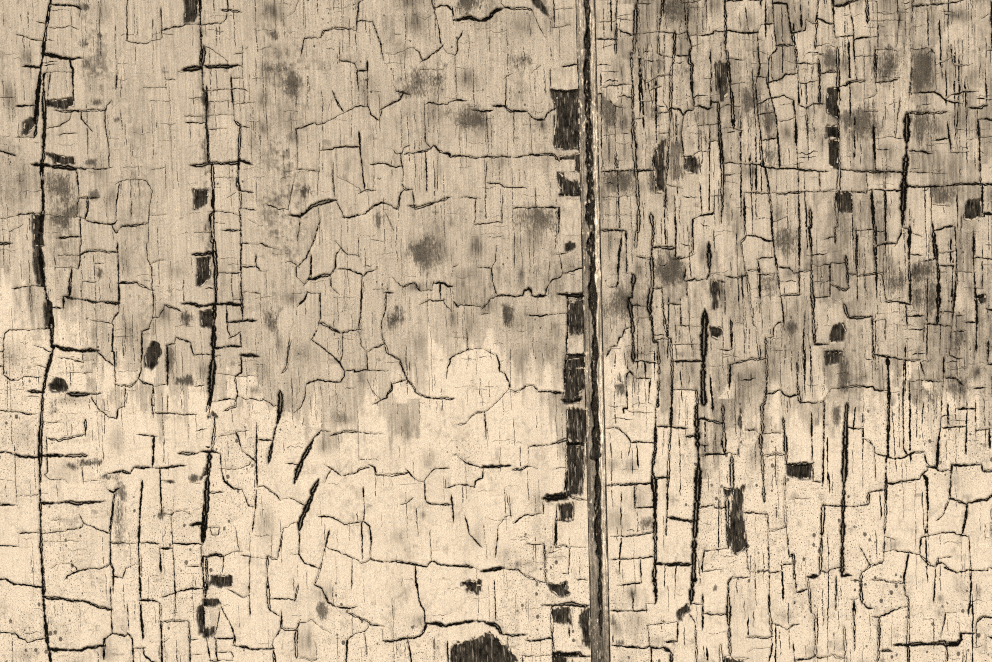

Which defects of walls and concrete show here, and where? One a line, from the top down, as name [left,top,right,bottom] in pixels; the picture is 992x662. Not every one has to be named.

peeling [551,67,581,251]
crack [0,0,590,662]
peeling [546,293,590,521]
crack [596,0,992,662]
peeling [724,485,746,555]
peeling [449,632,518,662]
peeling [552,651,577,662]
peeling [548,581,591,648]